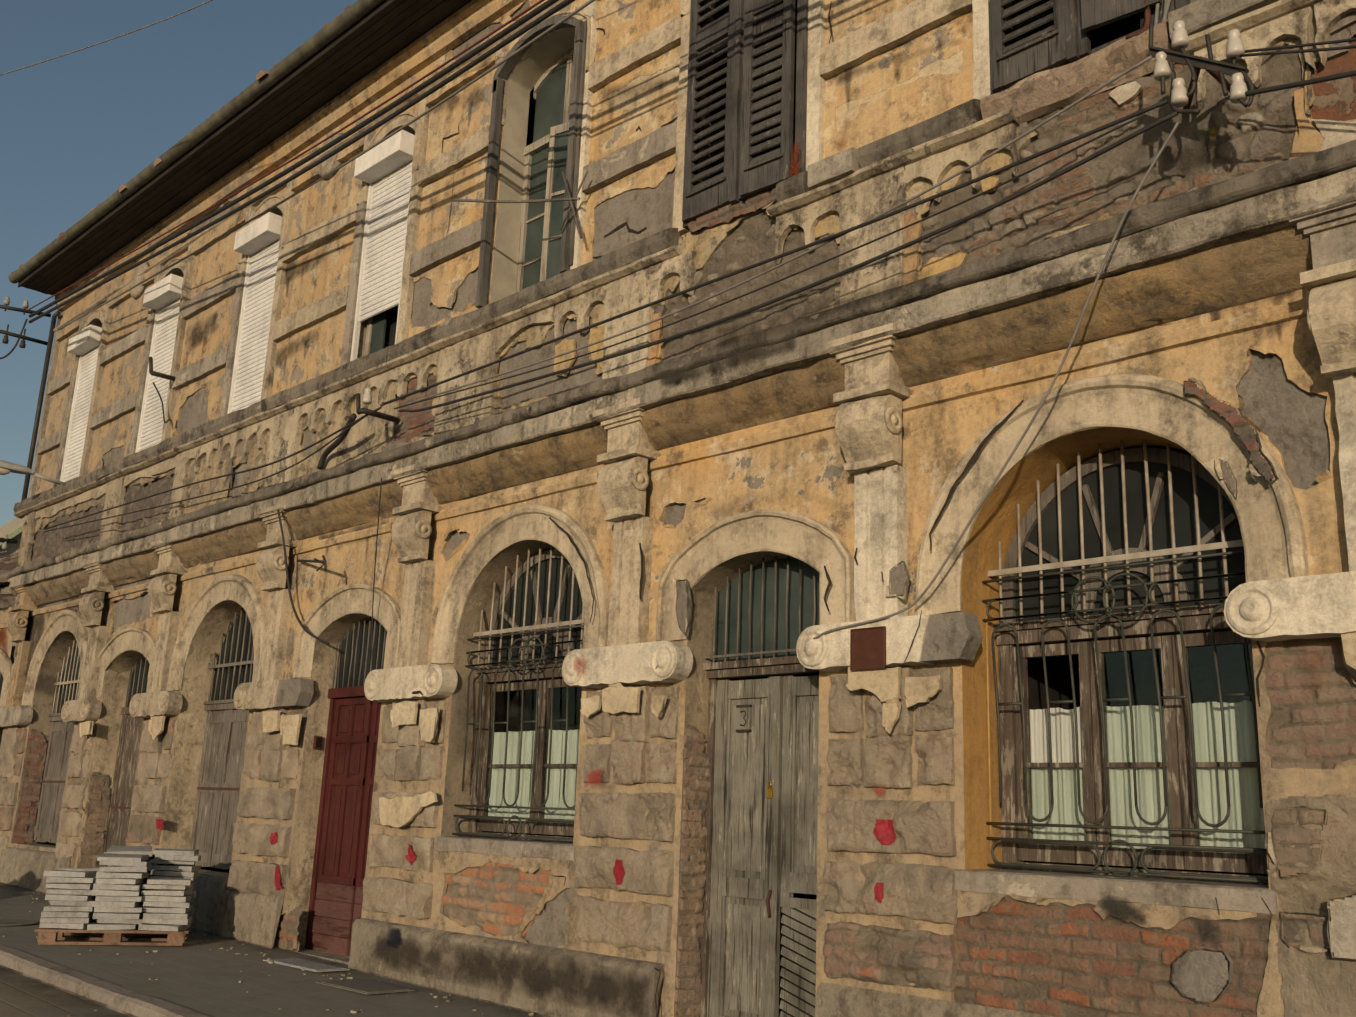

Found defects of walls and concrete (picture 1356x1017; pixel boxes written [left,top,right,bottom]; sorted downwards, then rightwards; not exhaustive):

flaking render [903,23,1356,285]
flaking render [411,264,479,328]
flaking render [593,164,841,366]
flaking render [1215,459,1237,500]
flaking render [1183,345,1332,490]
flaking render [1265,632,1356,769]
flaking render [442,861,572,947]
flaking render [954,794,1356,1017]